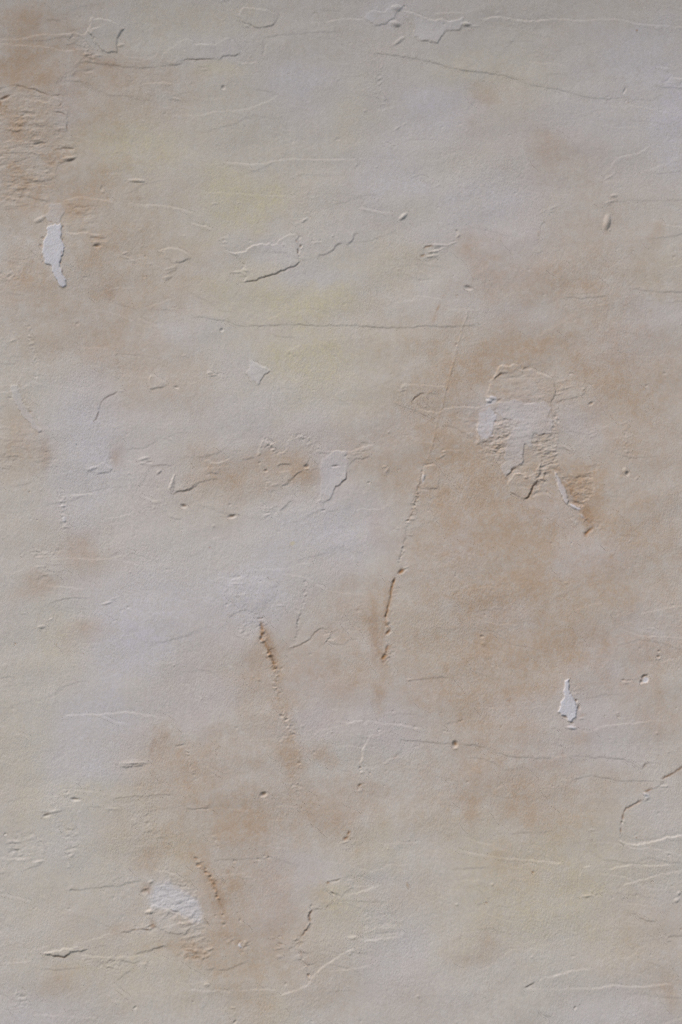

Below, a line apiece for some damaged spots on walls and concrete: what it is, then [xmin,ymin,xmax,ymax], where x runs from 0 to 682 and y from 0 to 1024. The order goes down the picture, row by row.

peeling [32,202,68,289]
water stain [466,330,568,394]
peeling [310,440,376,504]
crack [380,309,469,678]
spalling [475,362,603,539]
water stain [449,493,566,623]
peeling [557,678,588,737]